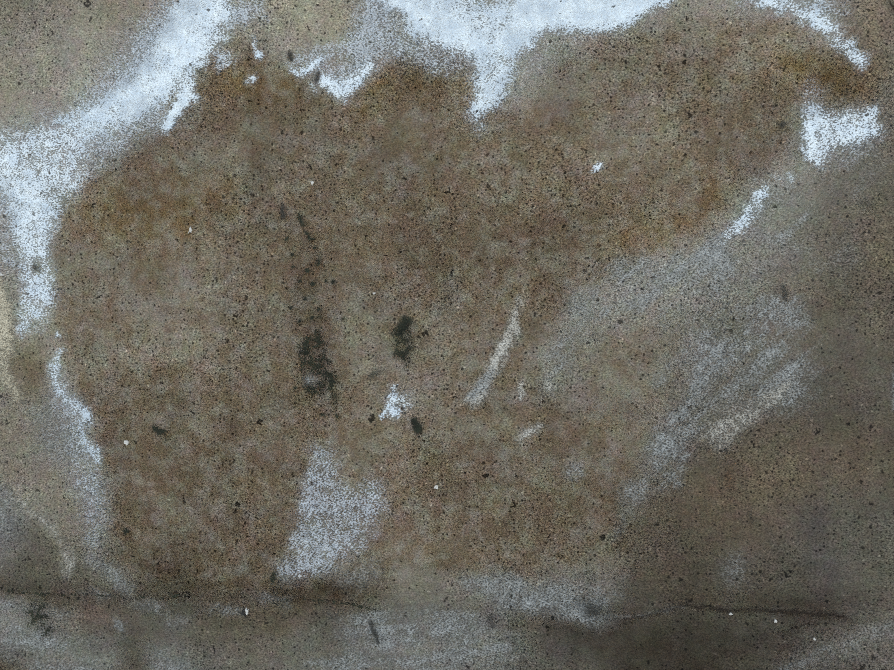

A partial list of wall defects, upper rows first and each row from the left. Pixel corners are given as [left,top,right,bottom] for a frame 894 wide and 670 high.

damp [288,0,674,127]
damp [756,0,870,68]
damp [801,101,882,165]
damp [290,213,335,286]
damp [616,185,769,312]
damp [49,349,100,462]
damp [294,307,343,418]
damp [380,385,410,420]
damp [391,316,415,368]
damp [411,417,423,437]
damp [653,285,806,463]
damp [269,450,382,583]